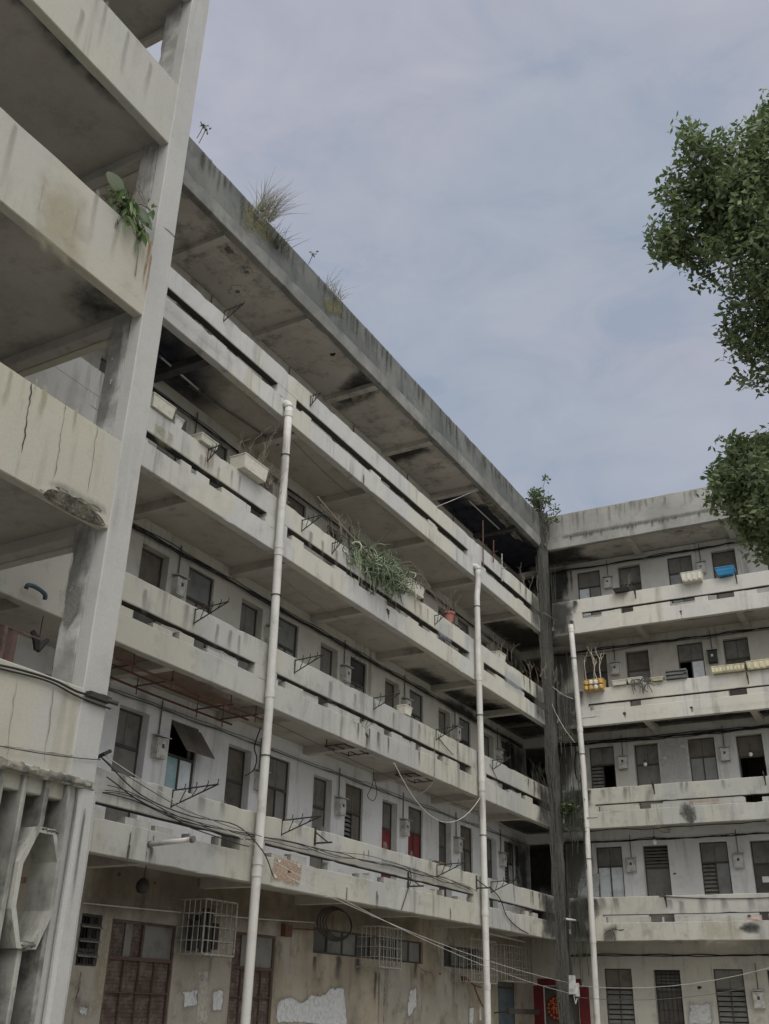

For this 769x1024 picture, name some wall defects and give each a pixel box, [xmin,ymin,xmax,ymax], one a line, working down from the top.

crack [21,384,32,453]
spalling [40,487,105,526]
water stain [411,505,769,941]
peeling [183,971,223,1024]
peeling [276,988,347,1024]
peeling [408,988,417,1016]